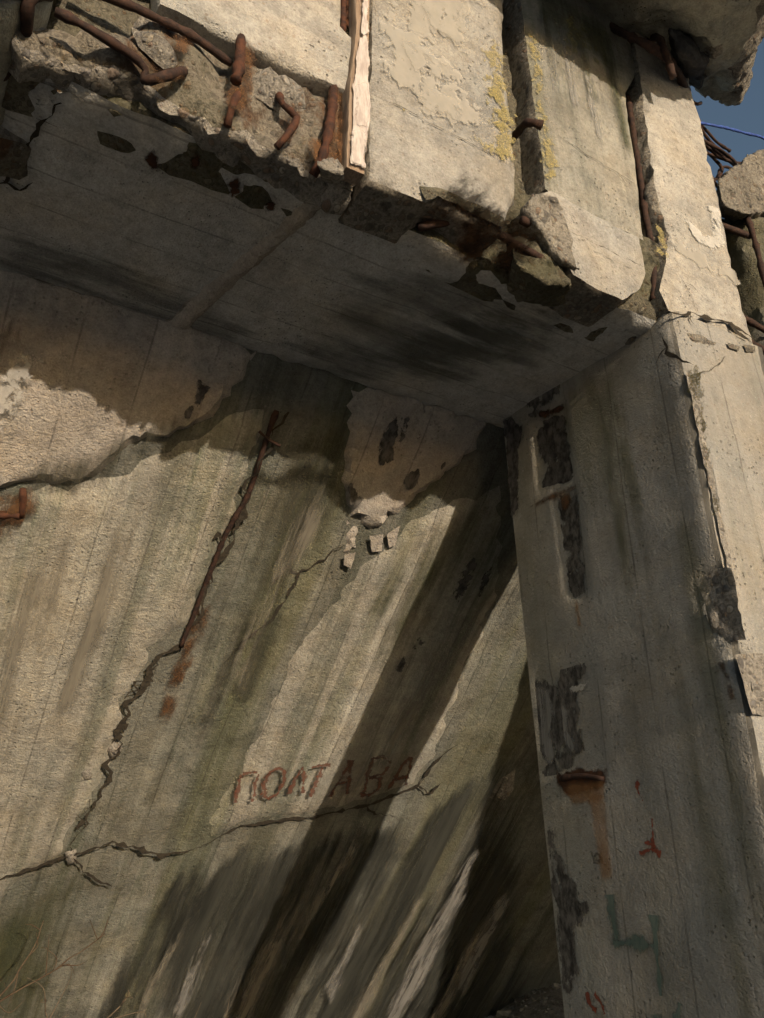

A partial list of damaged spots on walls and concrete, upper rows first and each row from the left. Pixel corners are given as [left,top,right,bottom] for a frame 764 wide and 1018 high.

rust [145,152,158,169]
damp [486,82,514,131]
damp [0,354,45,430]
flaking render [0,270,257,488]
damp [270,441,340,579]
peeling [567,566,586,598]
rust [161,606,210,714]
crack [0,412,457,887]
rust [556,767,607,815]
damp [99,773,527,1018]
damp [0,905,49,1018]